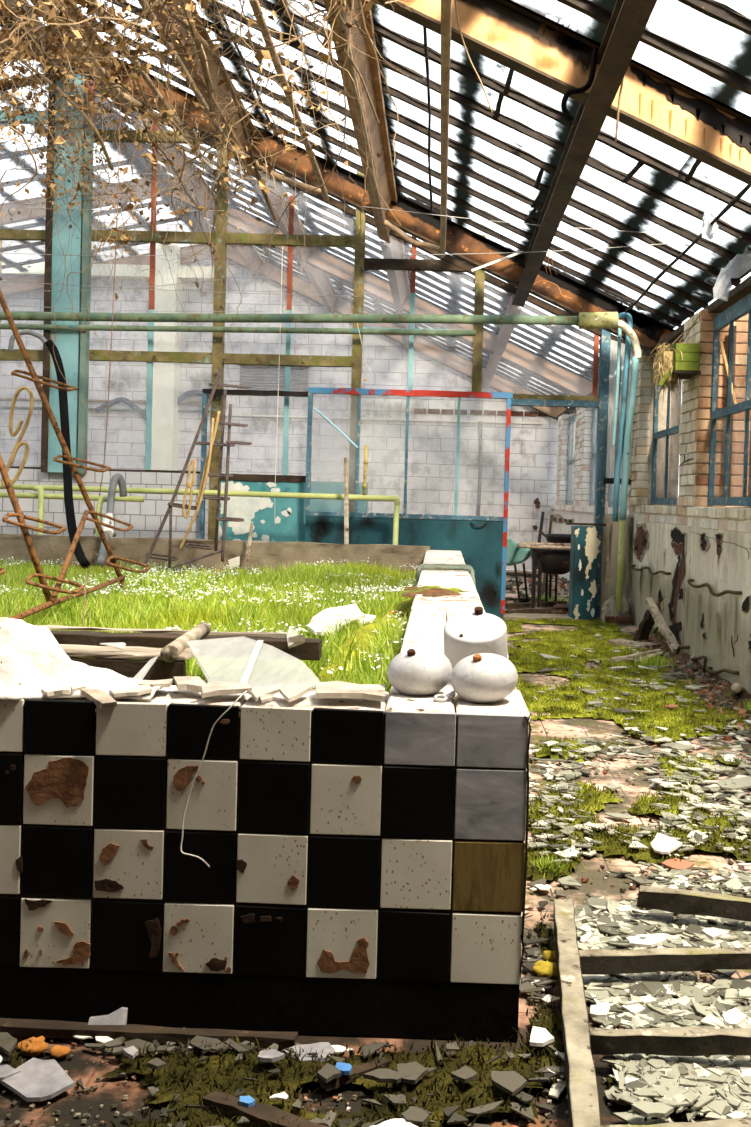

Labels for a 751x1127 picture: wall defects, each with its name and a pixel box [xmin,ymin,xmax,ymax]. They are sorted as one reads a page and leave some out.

peeling [218,481,292,541]
peeling [552,514,601,619]
spalling [633,523,649,563]
spalling [656,526,723,645]